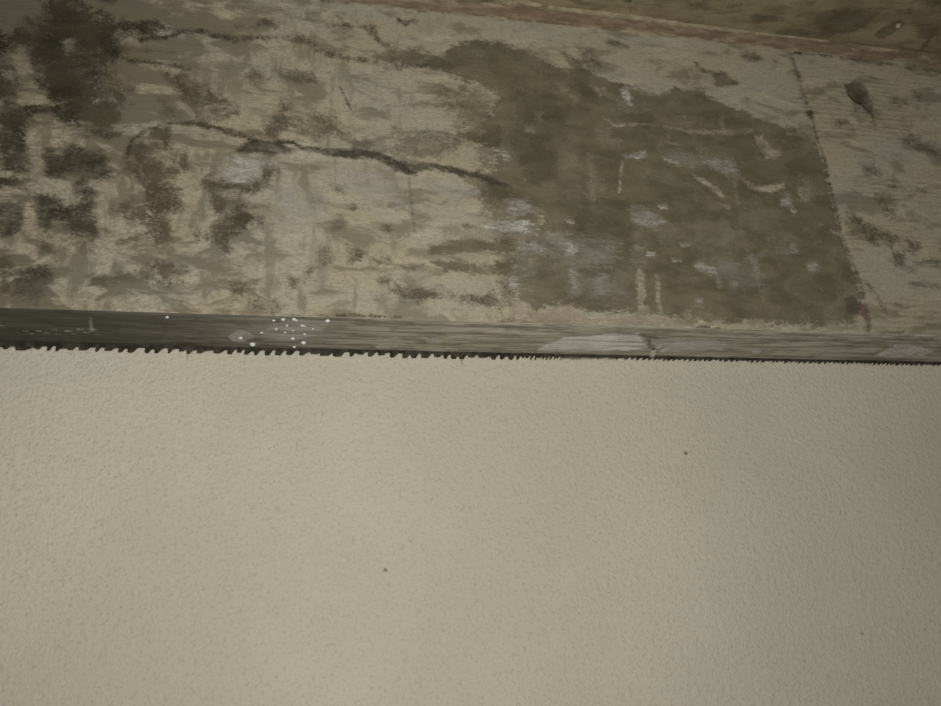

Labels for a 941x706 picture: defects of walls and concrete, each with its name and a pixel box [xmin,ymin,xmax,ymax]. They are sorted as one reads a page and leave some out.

damp [36,182,99,235]
damp [0,0,184,189]
damp [119,127,188,244]
damp [203,155,285,252]
crack [170,121,503,185]
damp [364,26,861,327]